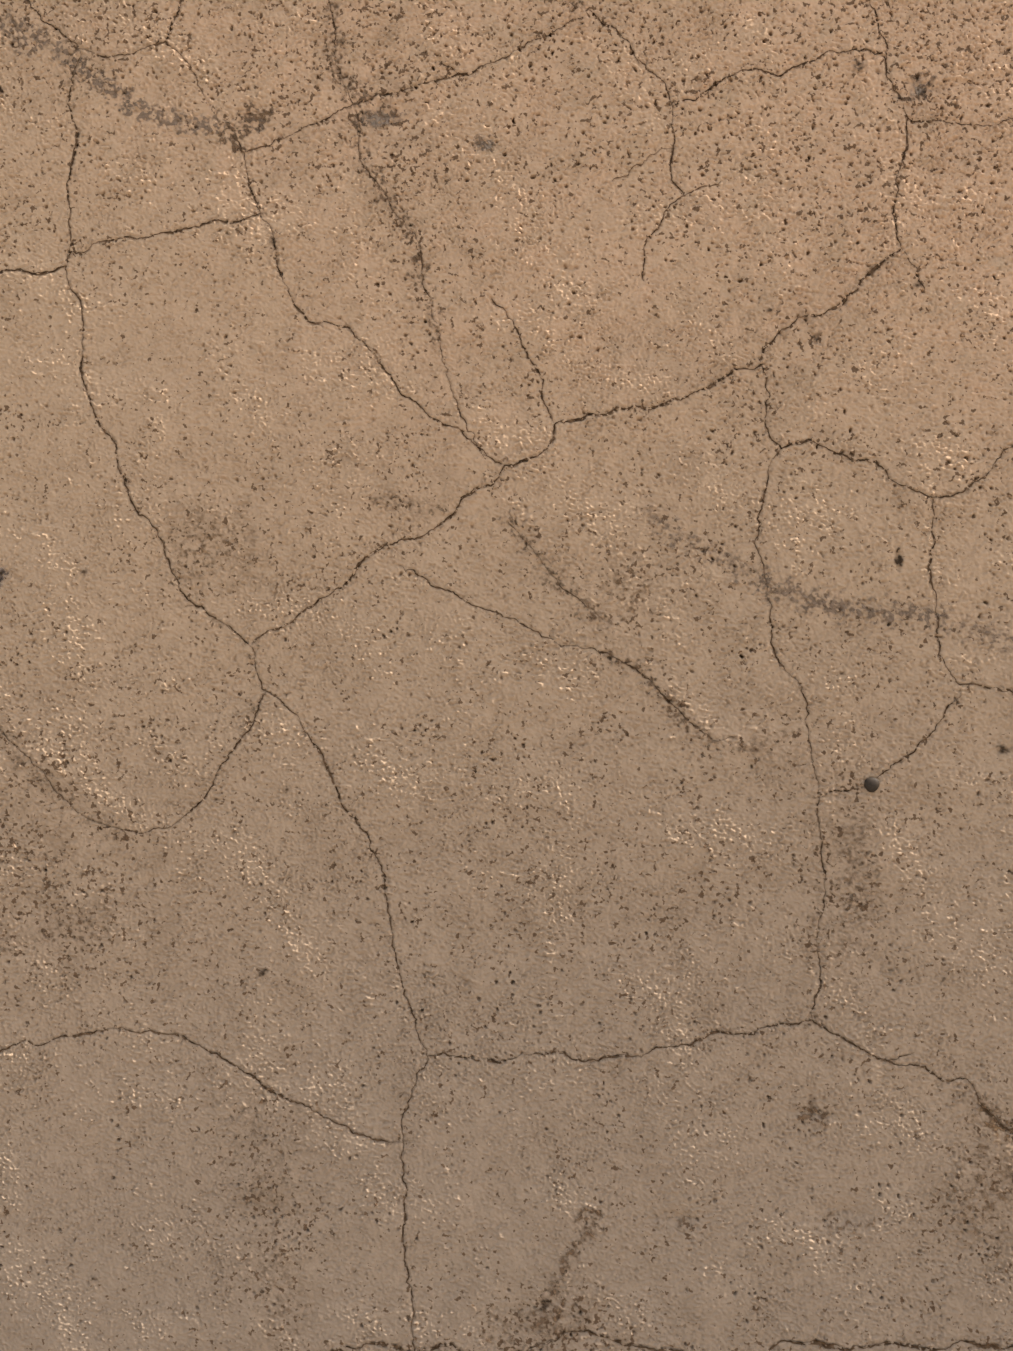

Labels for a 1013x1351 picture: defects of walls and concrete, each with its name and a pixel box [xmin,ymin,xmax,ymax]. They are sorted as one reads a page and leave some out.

crack [27,0,204,95]
crack [79,5,1013,1132]
crack [3,733,107,826]
crack [0,1027,460,1351]
crack [518,1330,680,1351]
crack [768,1340,1013,1351]